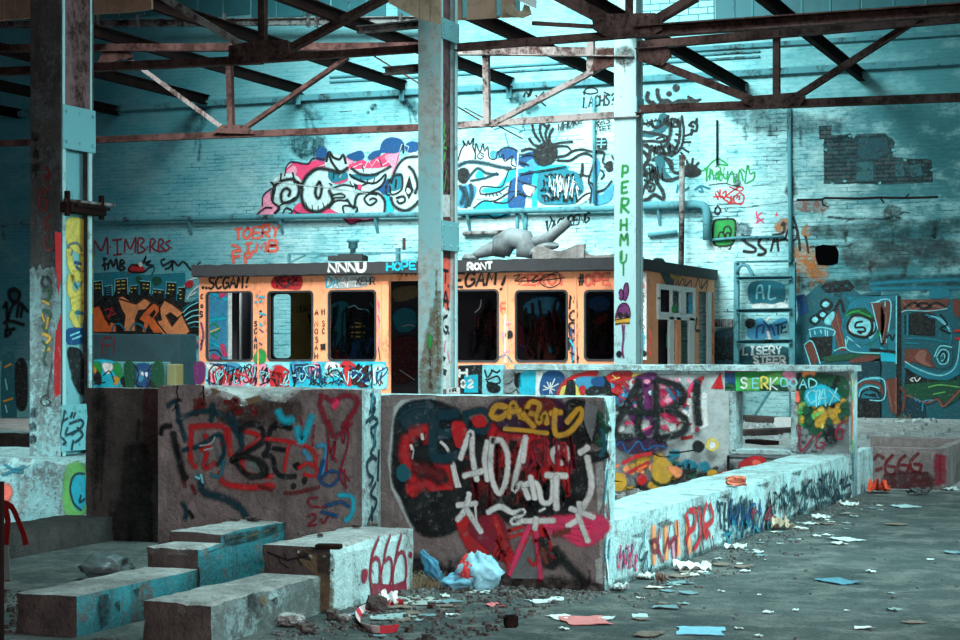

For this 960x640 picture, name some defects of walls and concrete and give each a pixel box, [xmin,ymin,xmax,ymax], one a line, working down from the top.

corrosion [615,46,632,65]
spalling [819,126,933,185]
water stain [812,221,959,289]
corrosion [419,272,443,394]